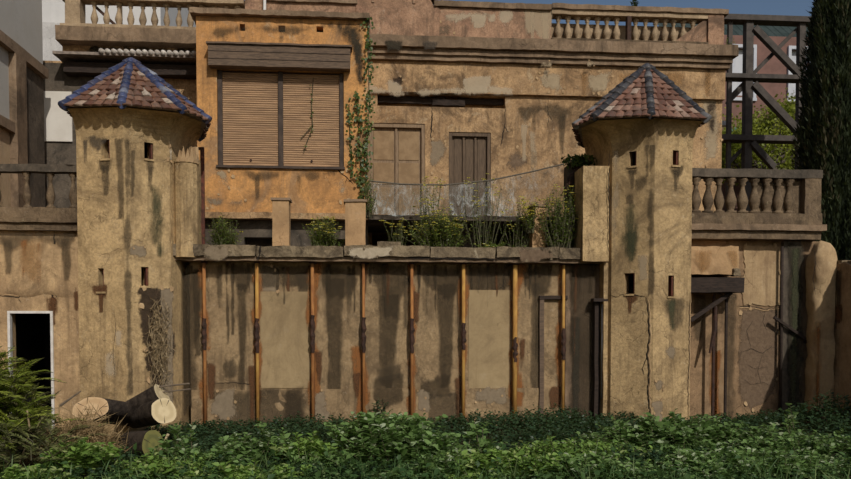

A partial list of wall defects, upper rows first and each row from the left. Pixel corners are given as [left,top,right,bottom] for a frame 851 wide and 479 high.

damp [338,24,403,96]
damp [419,76,512,95]
damp [148,162,161,253]
damp [614,170,654,292]
damp [218,263,311,424]
damp [322,265,356,389]
corrosion [352,346,370,420]
damp [369,264,511,426]
crack [611,289,652,414]
damp [666,300,683,329]
crack [737,306,780,387]
damp [834,271,842,333]